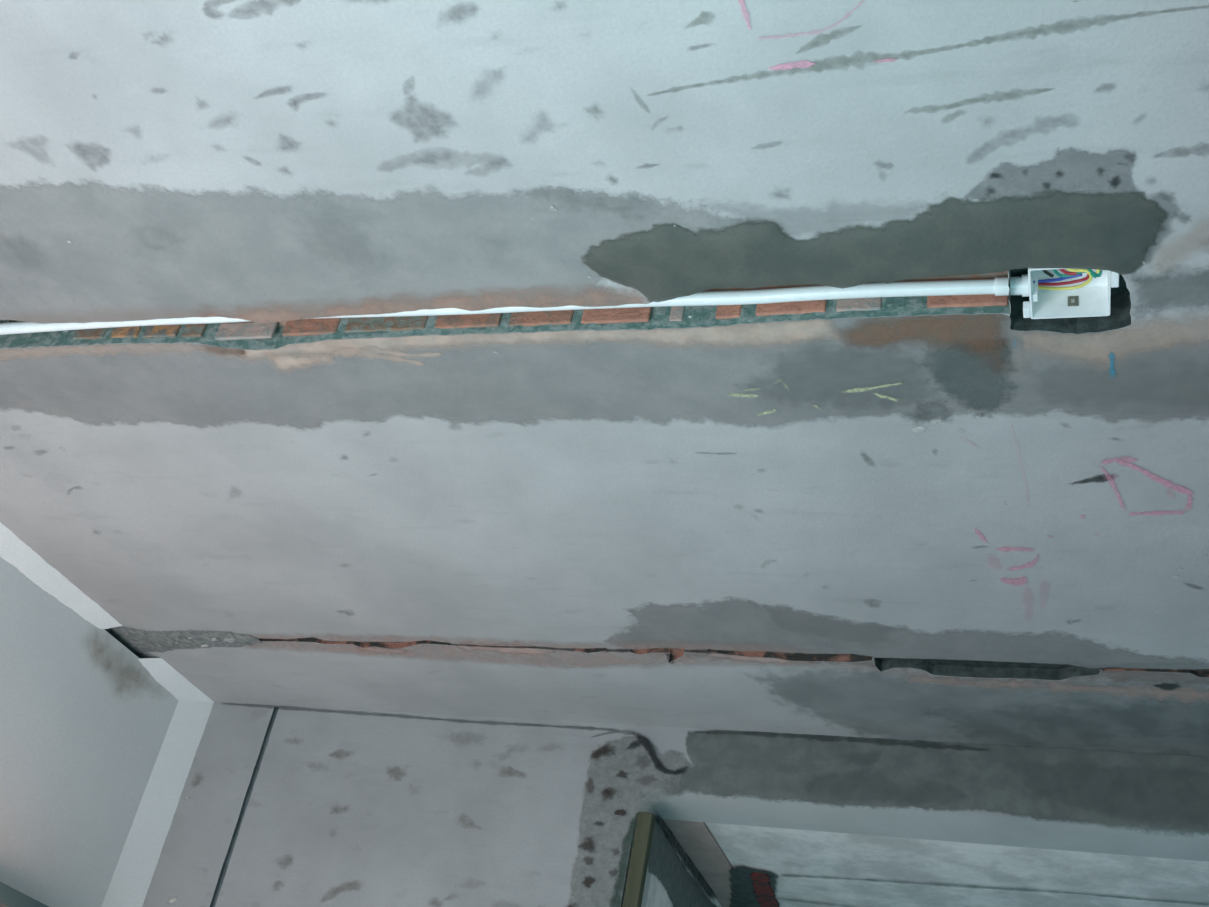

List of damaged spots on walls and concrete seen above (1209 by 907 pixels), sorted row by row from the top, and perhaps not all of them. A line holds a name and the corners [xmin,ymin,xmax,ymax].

damp [0,183,766,324]
spalling [1011,268,1028,277]
spalling [1111,274,1128,294]
corrosion [847,314,1004,349]
damp [0,314,1209,428]
flaking render [109,627,261,656]
crack [450,644,710,663]
damp [329,600,1209,702]
crack [741,651,891,661]
crack [924,659,1074,669]
damp [666,730,1209,835]
flaking render [568,737,690,907]